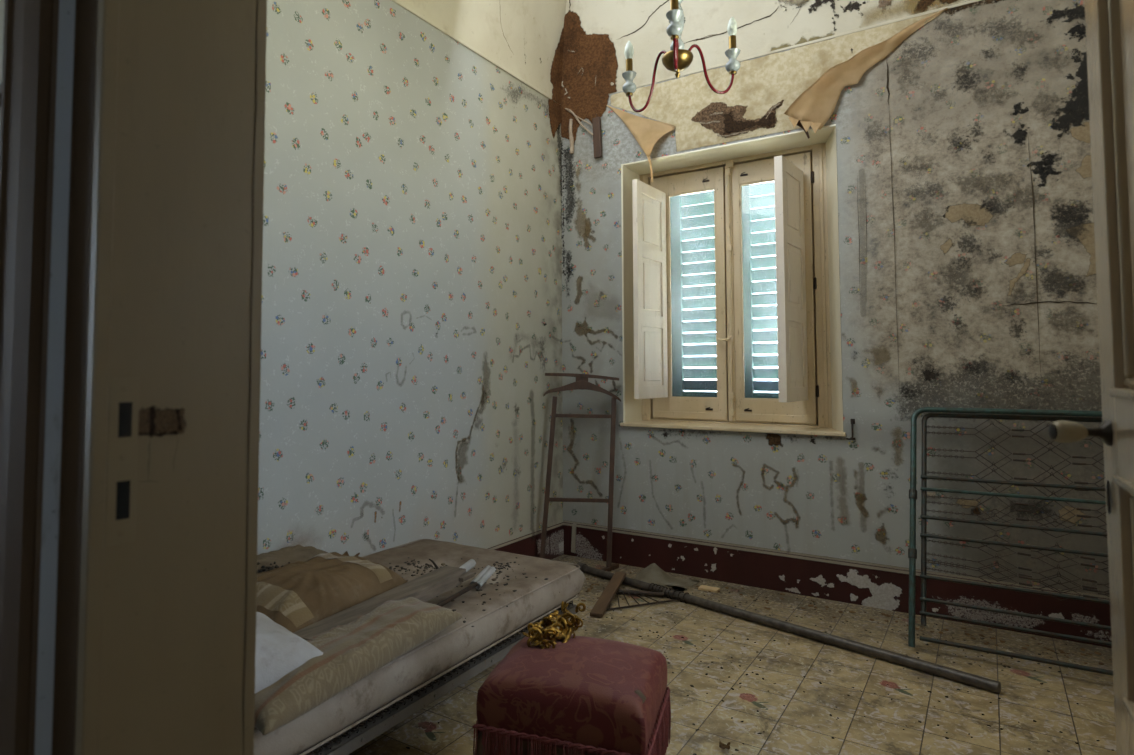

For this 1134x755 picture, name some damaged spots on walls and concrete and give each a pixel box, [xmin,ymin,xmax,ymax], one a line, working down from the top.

crack [621,0,669,38]
crack [684,6,800,44]
flaking render [548,8,947,182]
water stain [956,66,977,90]
water stain [1047,3,1090,139]
water stain [1003,102,1029,146]
water stain [1027,152,1062,187]
water stain [1052,201,1092,246]
water stain [1036,249,1085,298]
water stain [899,359,1102,421]
water stain [855,494,887,544]
peeling [536,529,605,601]